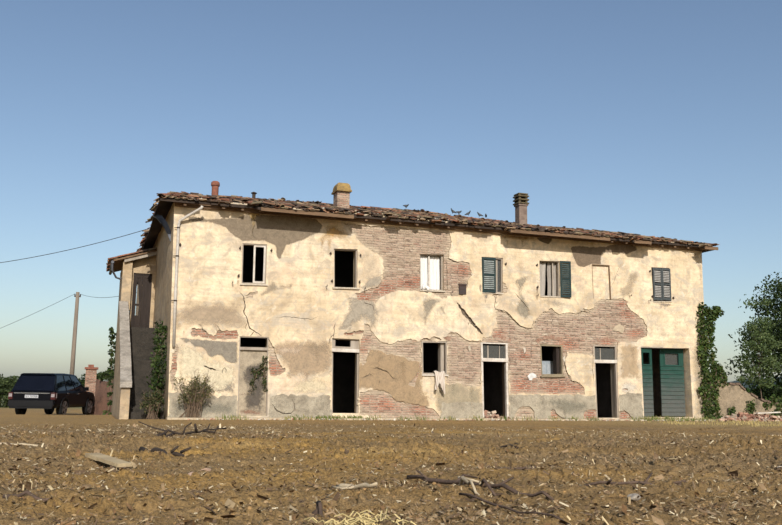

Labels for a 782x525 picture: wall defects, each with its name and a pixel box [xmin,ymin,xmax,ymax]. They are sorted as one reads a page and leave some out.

crack [243,294,260,336]
spalling [344,223,648,395]
peeling [170,326,239,389]
spalling [268,337,286,376]
spalling [357,389,440,418]